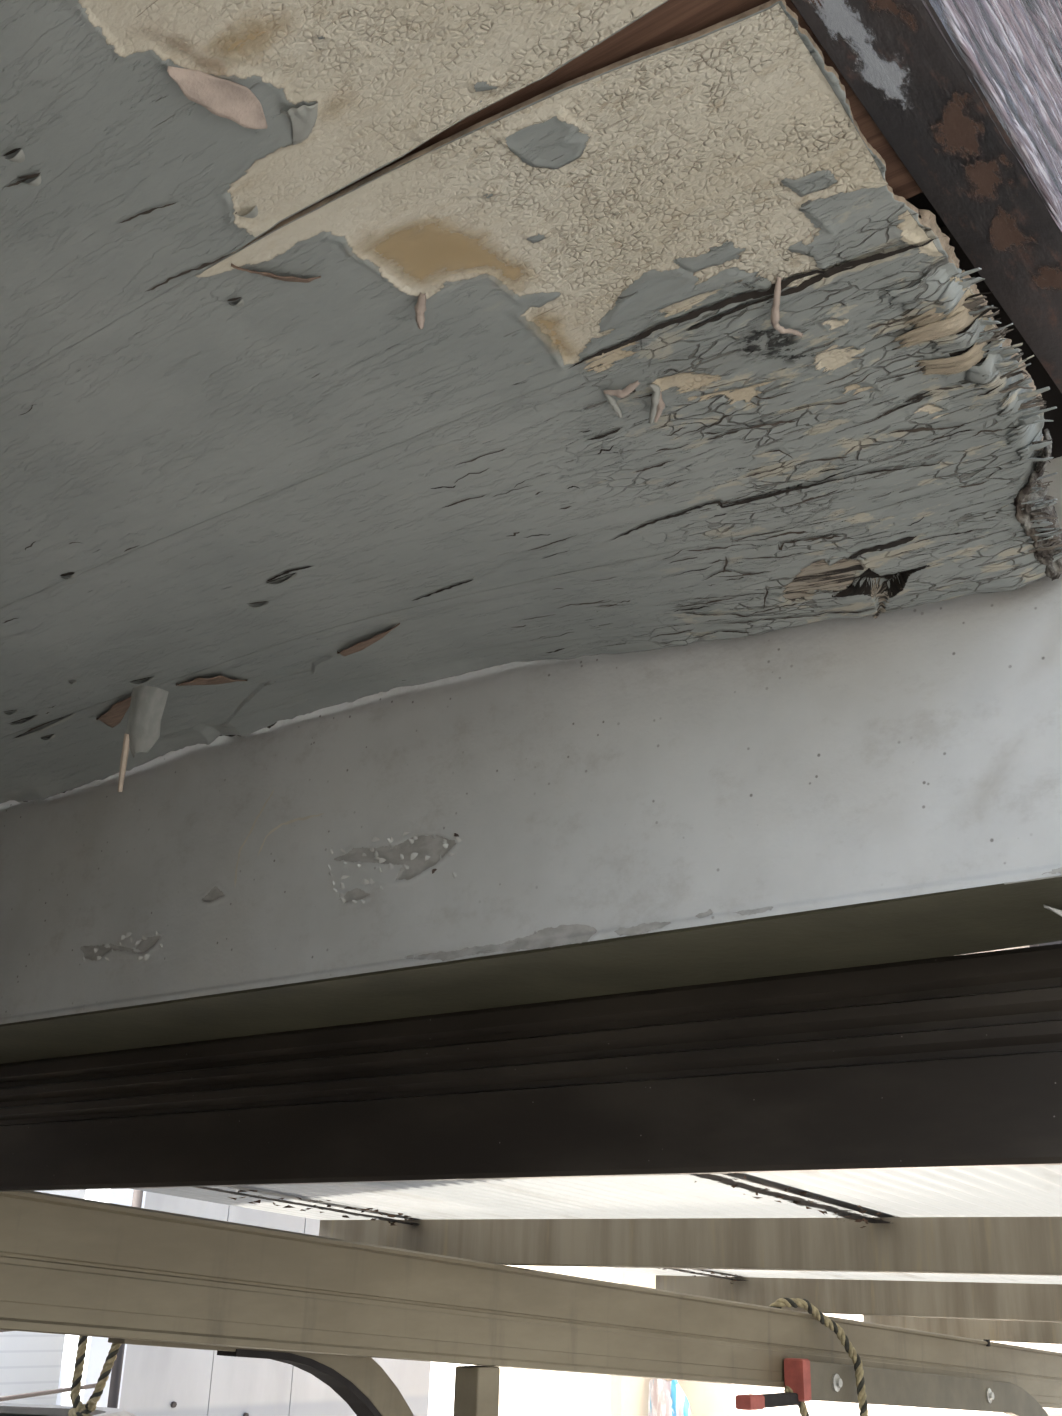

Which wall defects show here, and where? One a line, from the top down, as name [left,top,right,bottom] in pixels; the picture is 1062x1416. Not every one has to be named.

peeling [804,0,911,109]
peeling [79,0,888,373]
peeling [931,92,1037,252]
crack [567,236,944,370]
peeling [813,319,873,395]
peeling [879,210,1043,461]
crack [955,291,994,335]
crack [431,449,630,653]
crack [581,369,1017,639]
peeling [782,558,865,602]
peeling [328,832,462,904]
peeling [81,931,163,961]